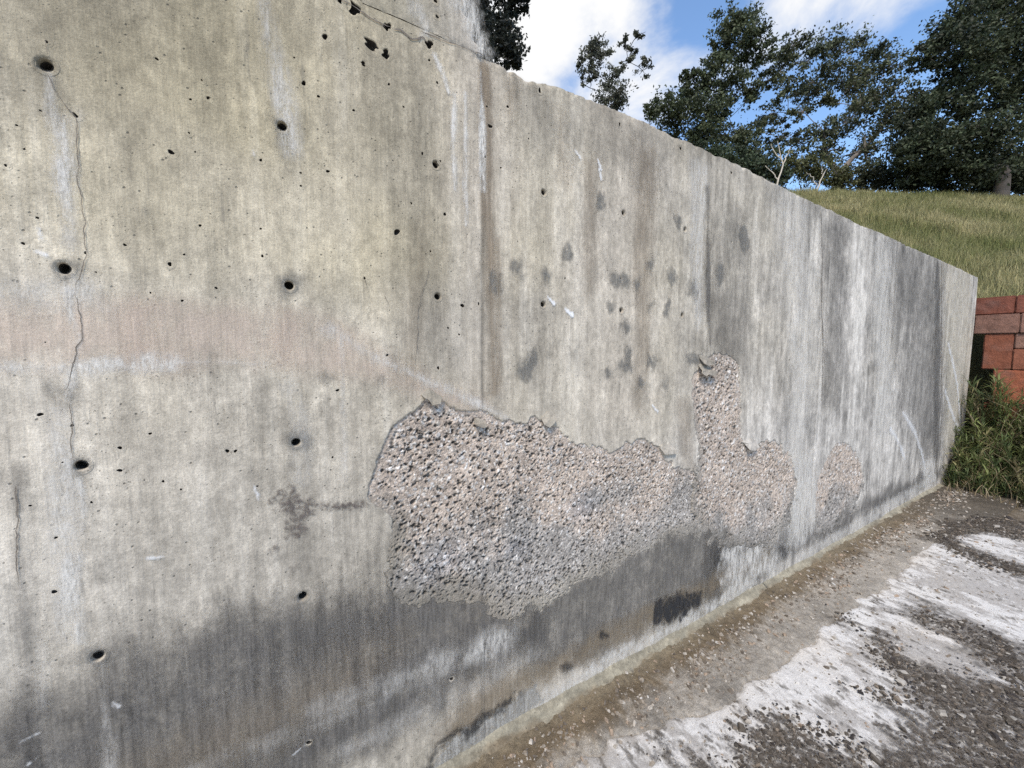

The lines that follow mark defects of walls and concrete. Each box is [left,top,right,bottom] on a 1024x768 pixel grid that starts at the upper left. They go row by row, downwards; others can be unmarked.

crack [45,40,87,458]
leakage [0,252,969,768]
peeling [269,353,798,621]
peeling [814,442,864,540]